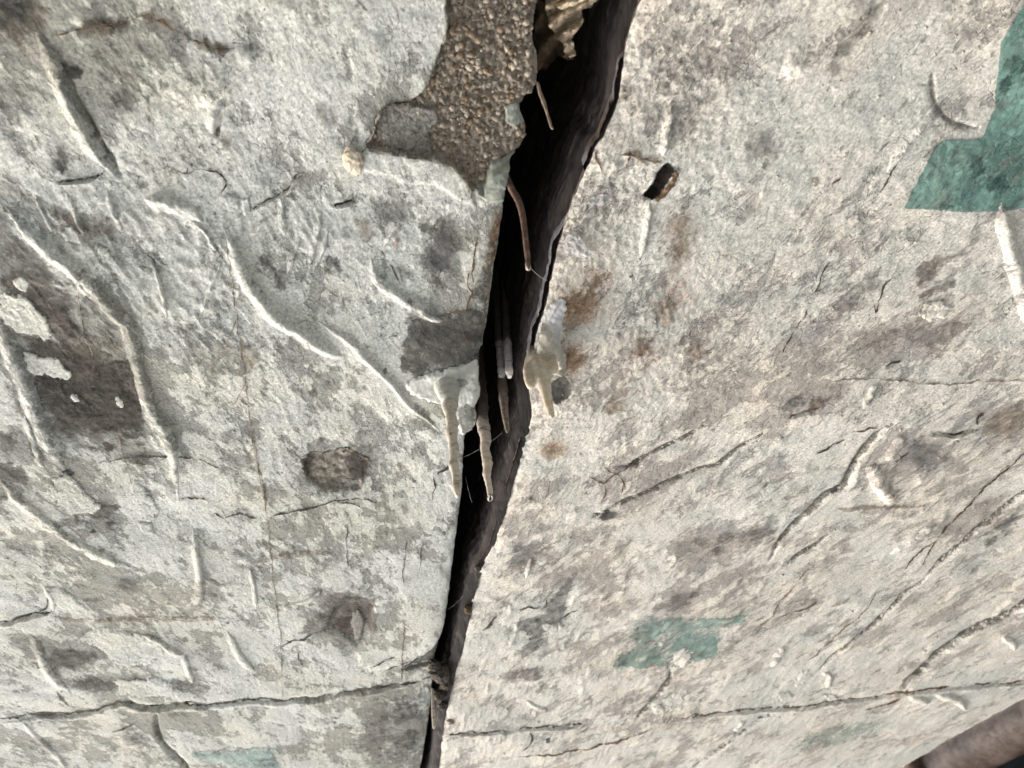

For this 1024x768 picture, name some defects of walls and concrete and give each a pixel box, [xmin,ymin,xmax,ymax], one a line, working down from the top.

spalling [366,0,538,202]
crack [594,152,661,173]
leakage [399,251,495,436]
leakage [537,299,567,383]
crack [816,427,878,454]
crack [928,413,984,442]
crack [0,226,431,733]
crack [430,465,449,504]
crack [589,464,631,502]
crack [904,454,1024,571]
crack [756,567,819,634]
crack [447,681,1024,758]